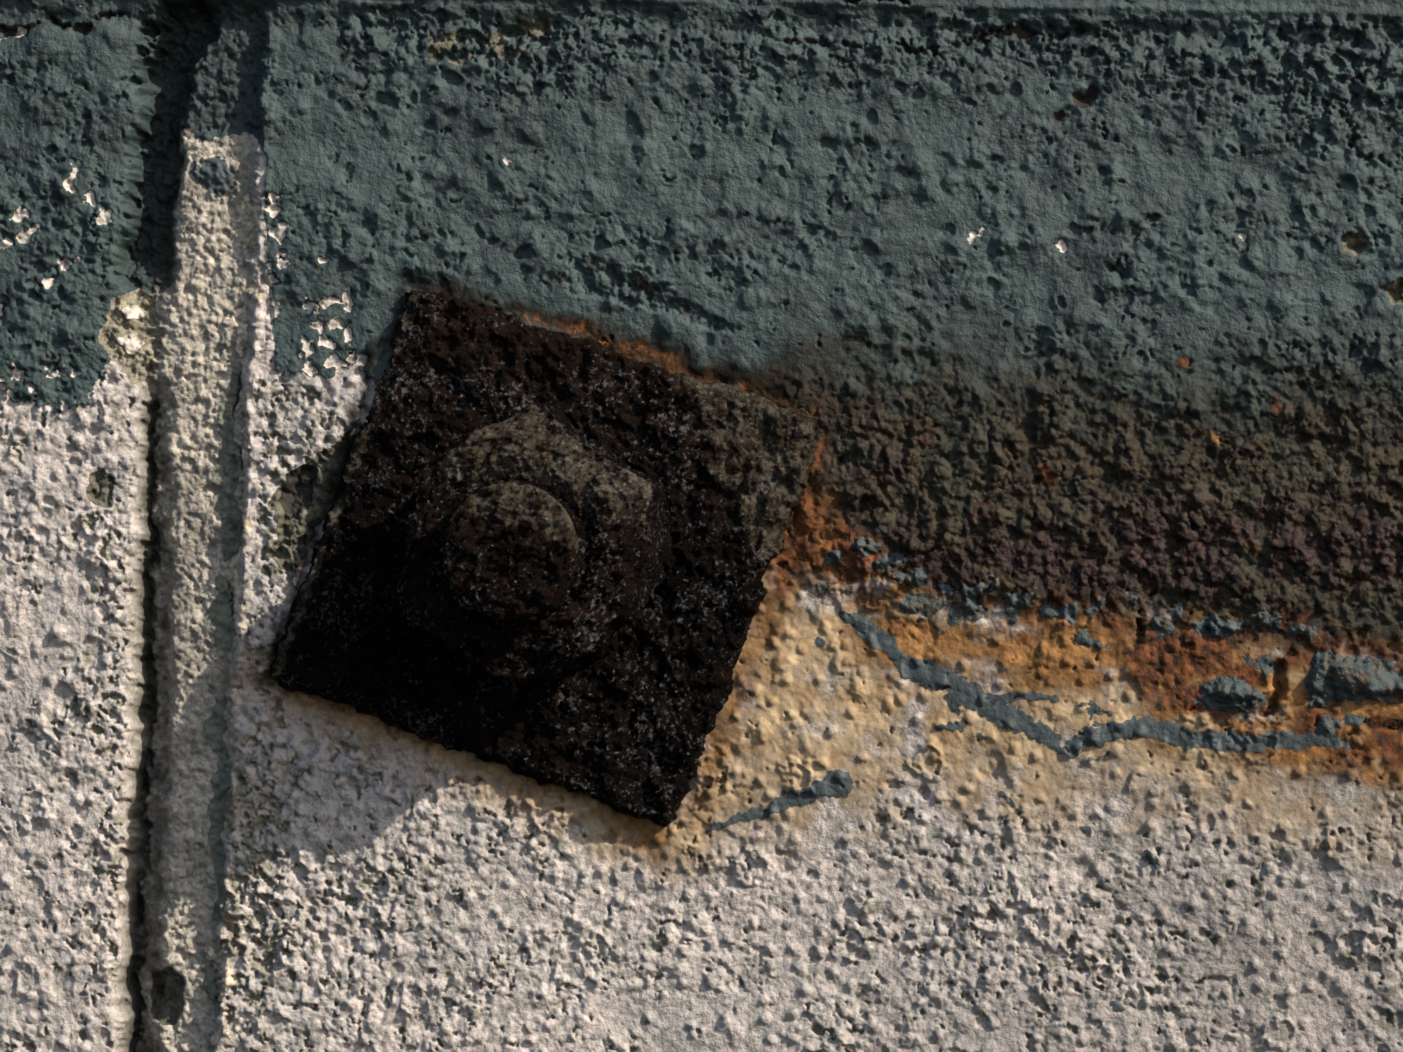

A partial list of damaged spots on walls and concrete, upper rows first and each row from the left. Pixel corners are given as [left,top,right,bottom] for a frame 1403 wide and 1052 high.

peeling [0,206,39,250]
peeling [63,162,113,225]
spalling [98,288,165,383]
peeling [299,287,355,377]
peeling [189,154,290,652]
spalling [86,469,115,508]
spalling [267,430,351,571]
corrosion [247,273,1403,862]
peeling [811,536,1108,651]
peeling [1150,601,1403,739]
peeling [200,681,238,1052]
spalling [150,966,185,1025]